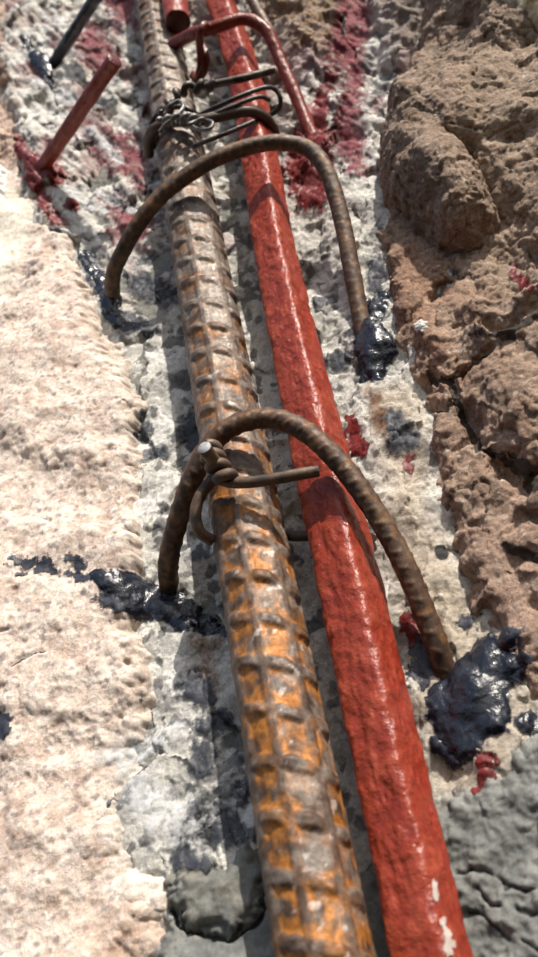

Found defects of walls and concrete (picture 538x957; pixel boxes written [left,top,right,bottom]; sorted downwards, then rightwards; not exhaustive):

peeling [439,916,456,957]